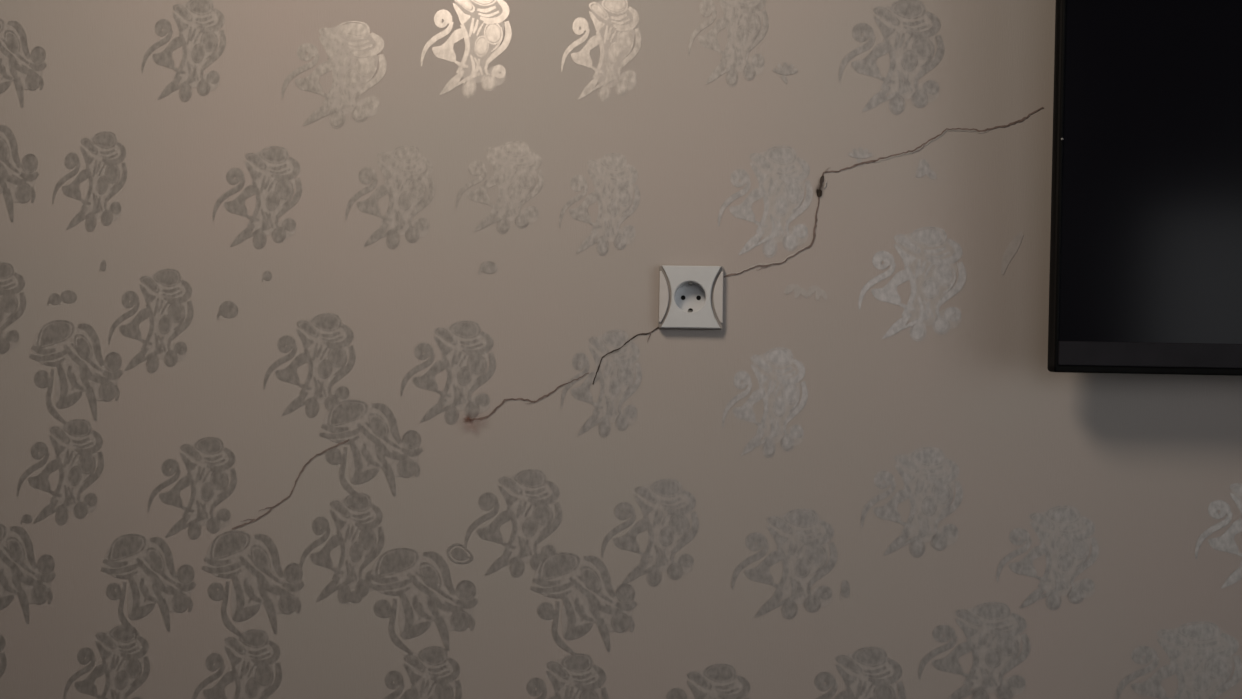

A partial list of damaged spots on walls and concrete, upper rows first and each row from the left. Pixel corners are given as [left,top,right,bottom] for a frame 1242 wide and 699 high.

crack [724,107,1044,278]
crack [470,327,659,421]
crack [232,439,349,529]